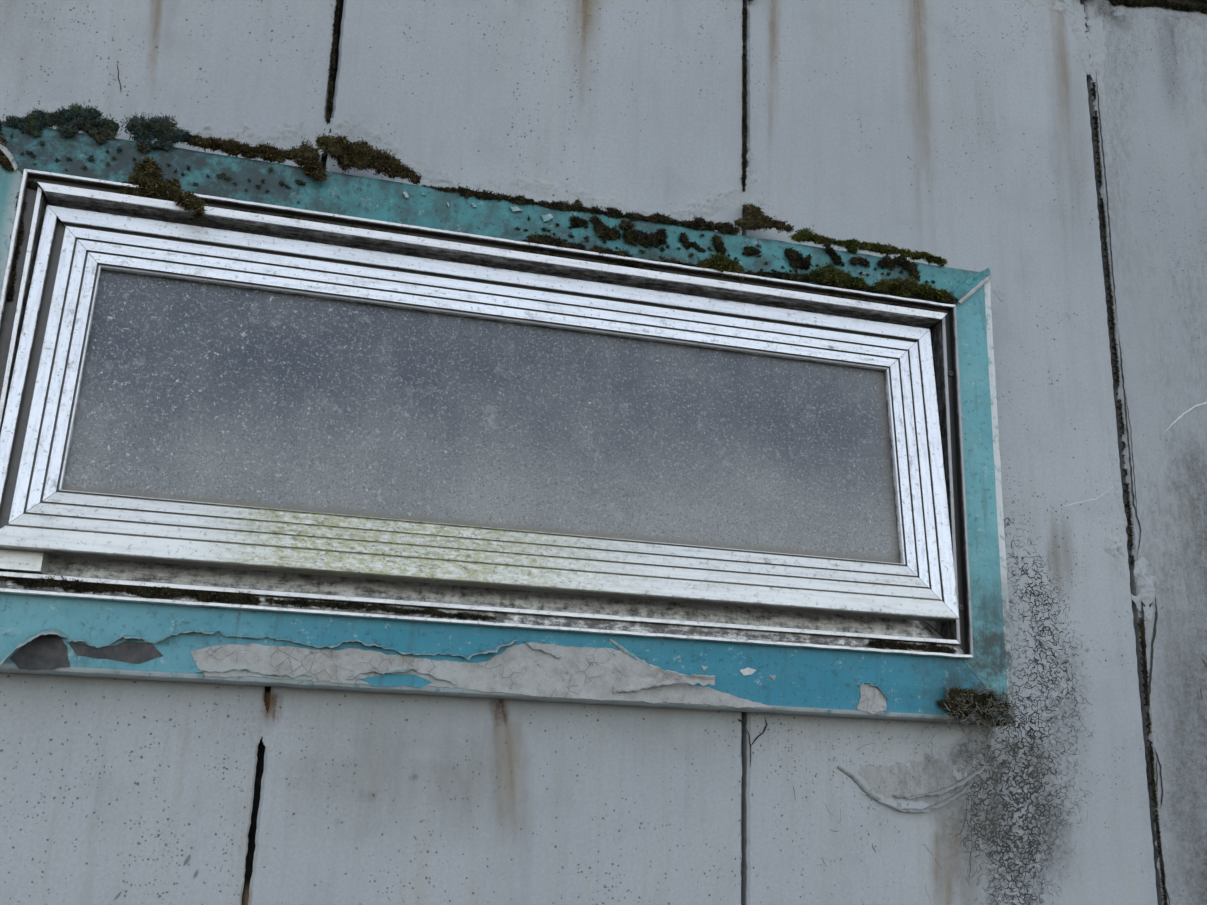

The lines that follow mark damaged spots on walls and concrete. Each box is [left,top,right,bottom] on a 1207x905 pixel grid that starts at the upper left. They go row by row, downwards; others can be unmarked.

peeling [0,629,775,708]
peeling [856,682,888,714]
peeling [837,753,985,813]